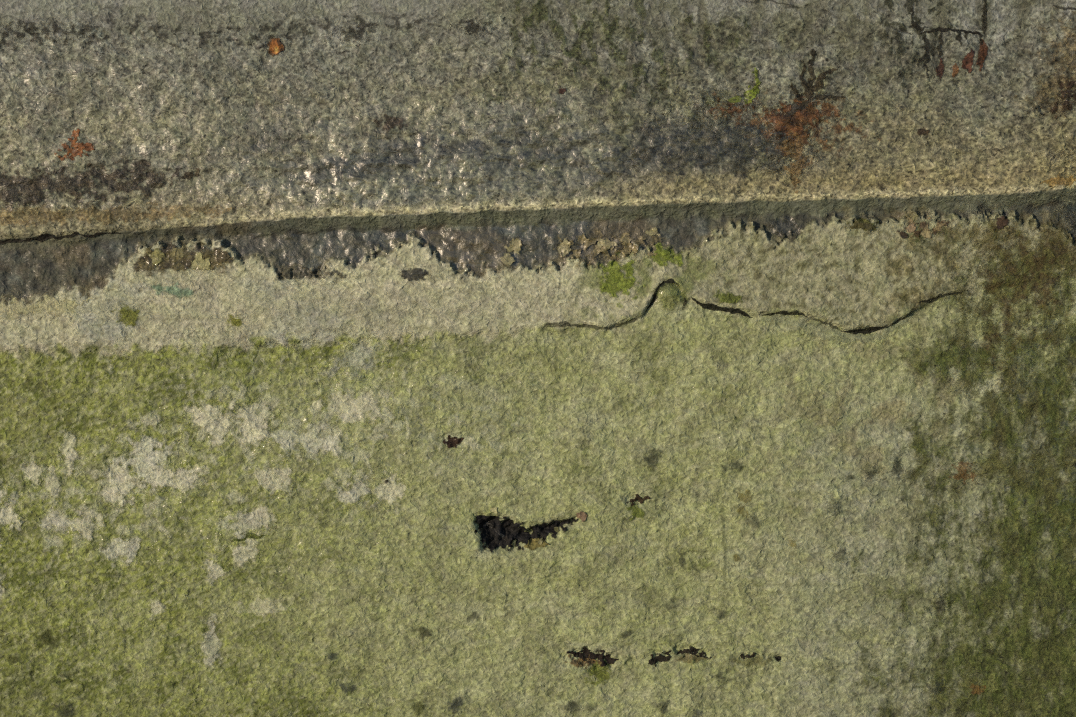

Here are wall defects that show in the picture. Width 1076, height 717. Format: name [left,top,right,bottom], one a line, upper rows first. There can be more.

corrosion [936,39,988,78]
corrosion [709,94,861,155]
corrosion [54,129,94,161]
leakage [0,159,207,212]
spalling [133,243,234,276]
spalling [401,266,428,281]
crack [645,279,806,318]
crack [916,290,968,303]
leakage [981,223,1076,370]
crack [845,326,887,335]
spalling [565,646,619,685]
spalling [648,646,711,667]